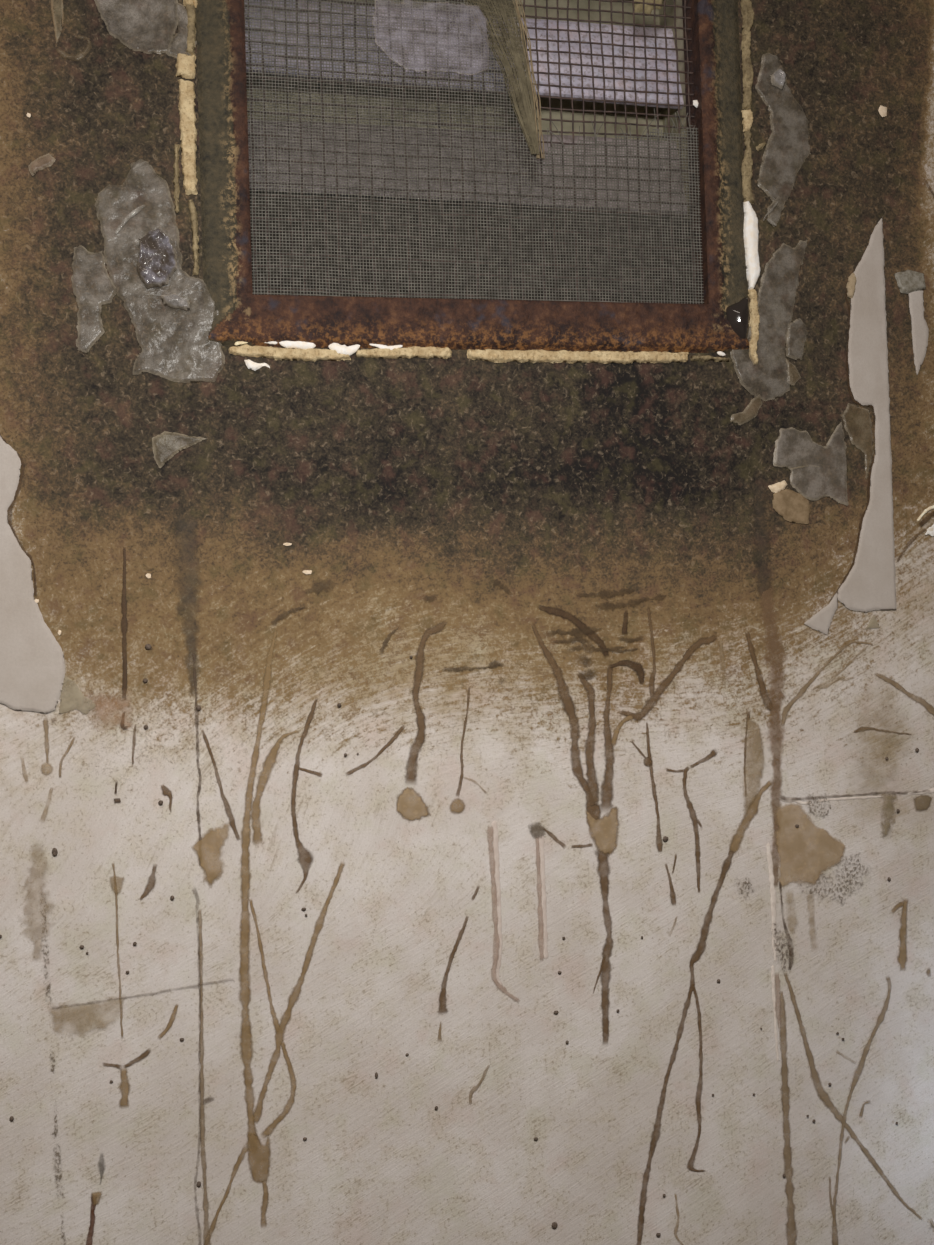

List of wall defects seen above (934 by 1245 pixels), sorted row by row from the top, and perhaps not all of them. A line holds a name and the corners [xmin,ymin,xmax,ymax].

peeling [804,218,934,635]
peeling [0,435,96,714]
leakage [776,804,845,886]